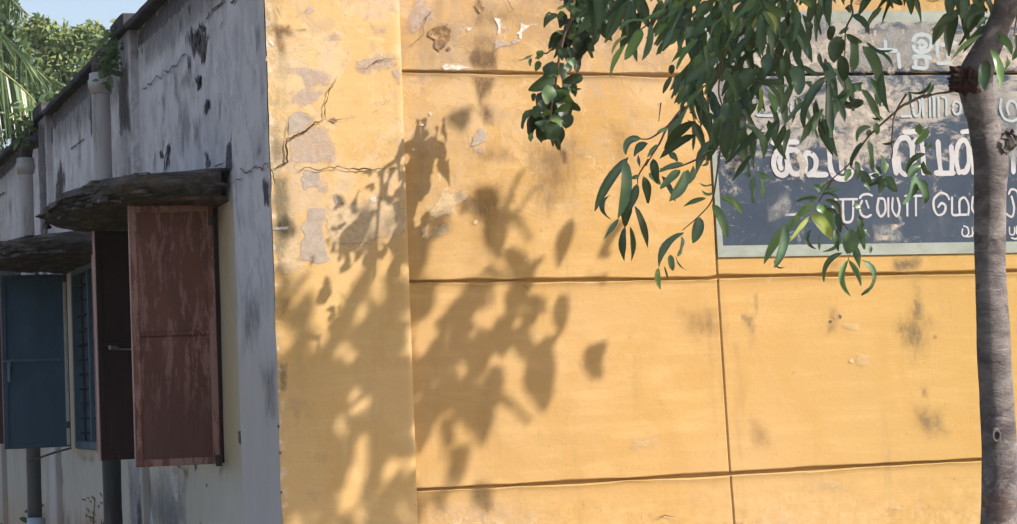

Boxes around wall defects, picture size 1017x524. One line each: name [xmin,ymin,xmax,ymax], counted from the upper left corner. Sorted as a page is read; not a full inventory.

crack [205,0,235,38]
flaking render [410,0,471,51]
peeling [494,18,529,49]
water stain [109,60,129,175]
crack [143,53,185,89]
water stain [137,0,212,135]
crack [214,1,442,186]
water stain [472,52,496,97]
water stain [33,81,93,234]
water stain [141,143,170,172]
peeling [274,67,406,274]
peeling [421,189,466,237]